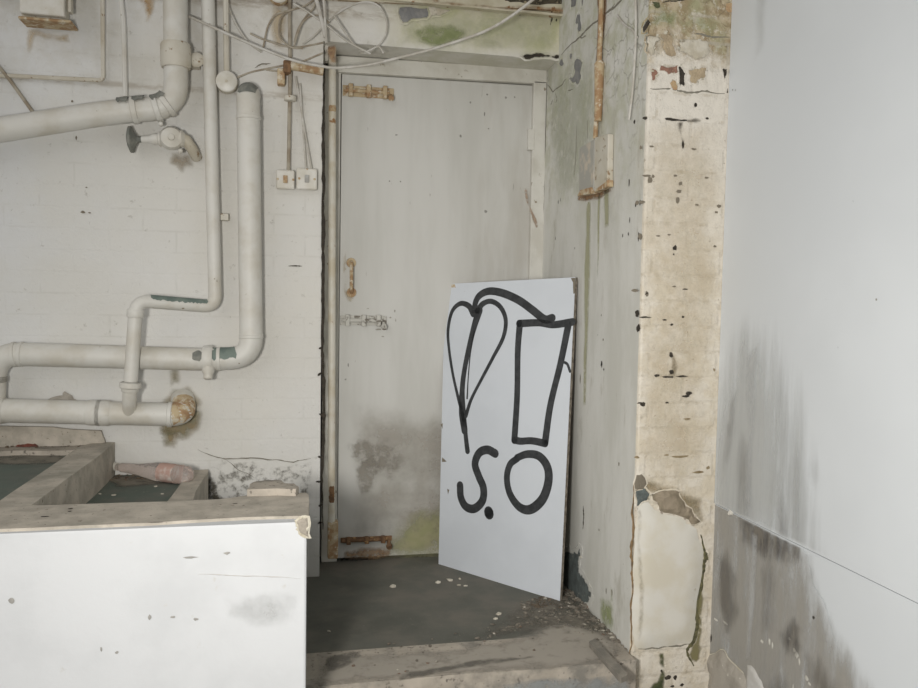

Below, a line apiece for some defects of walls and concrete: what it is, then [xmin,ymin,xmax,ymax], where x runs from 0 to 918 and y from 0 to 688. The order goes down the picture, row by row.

spalling [641,15,708,93]
crack [199,50,326,530]
rust [163,394,199,444]
leakage [208,468,253,499]
flaking render [633,473,702,526]
leakage [744,521,799,555]
leakage [721,563,730,615]